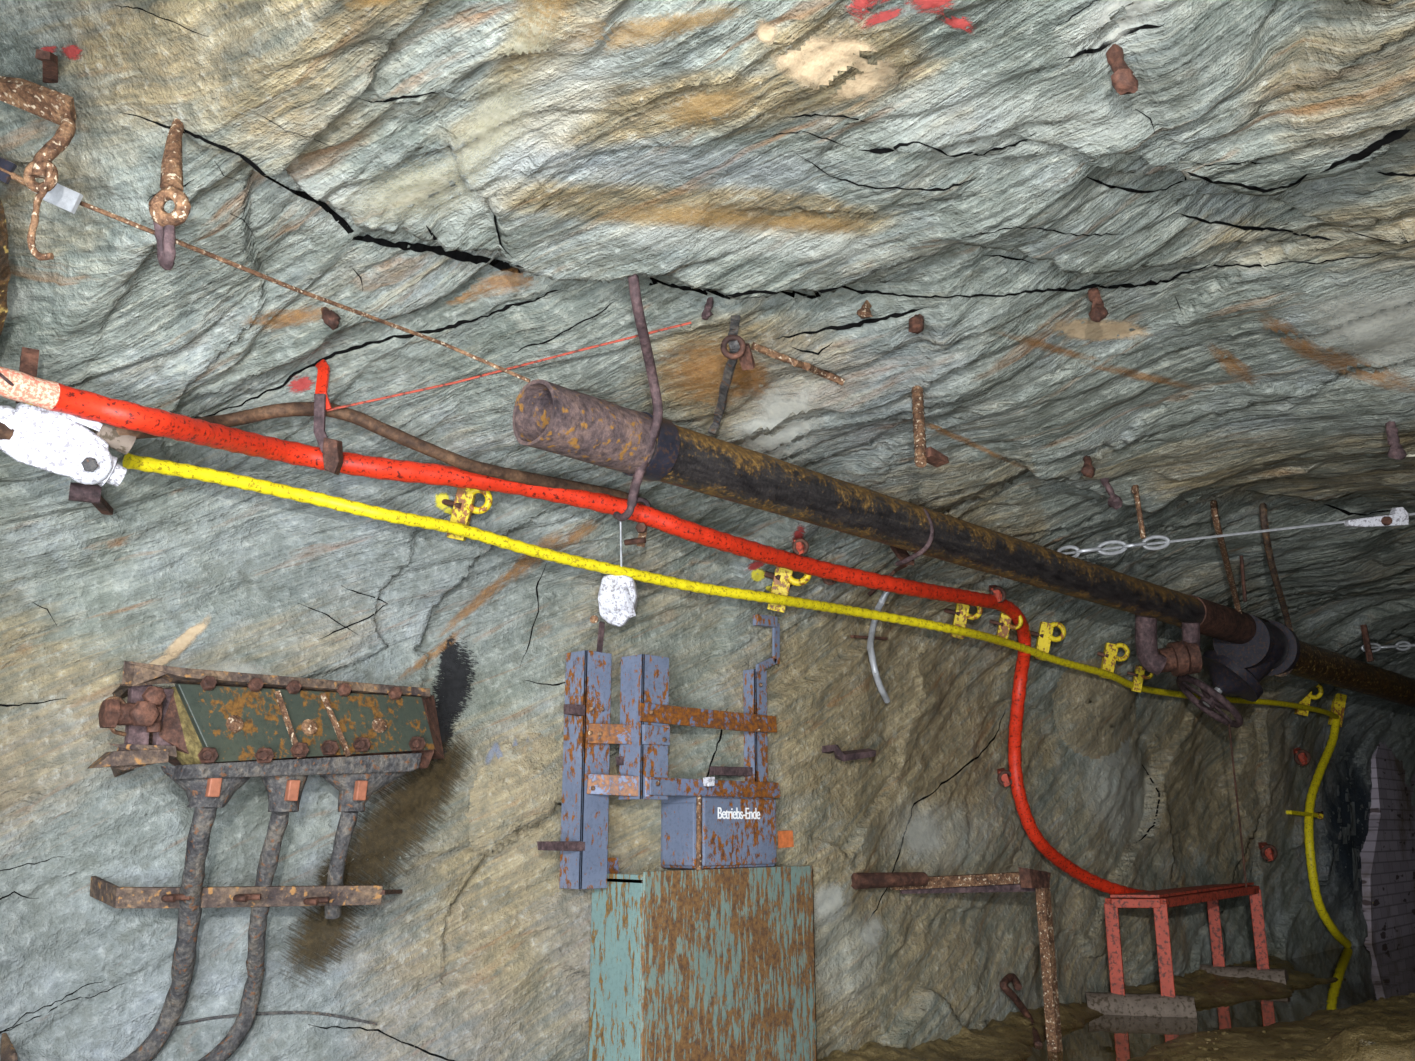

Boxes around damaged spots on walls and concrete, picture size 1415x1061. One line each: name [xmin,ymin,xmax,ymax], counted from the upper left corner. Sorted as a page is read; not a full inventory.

leakage [1325,747,1372,903]